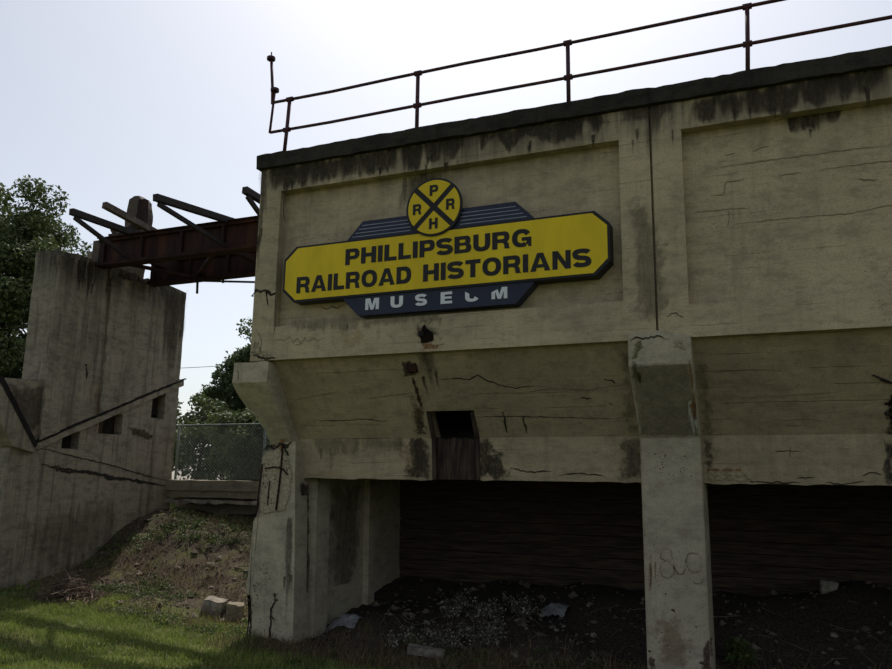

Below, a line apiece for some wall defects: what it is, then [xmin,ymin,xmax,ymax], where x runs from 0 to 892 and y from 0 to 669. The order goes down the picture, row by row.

leakage [693,68,882,133]
crack [251,289,321,360]
crack [630,312,683,342]
crack [443,374,625,433]
crack [40,448,166,486]
spalling [255,443,292,517]
crack [483,461,605,478]
crack [248,593,278,638]